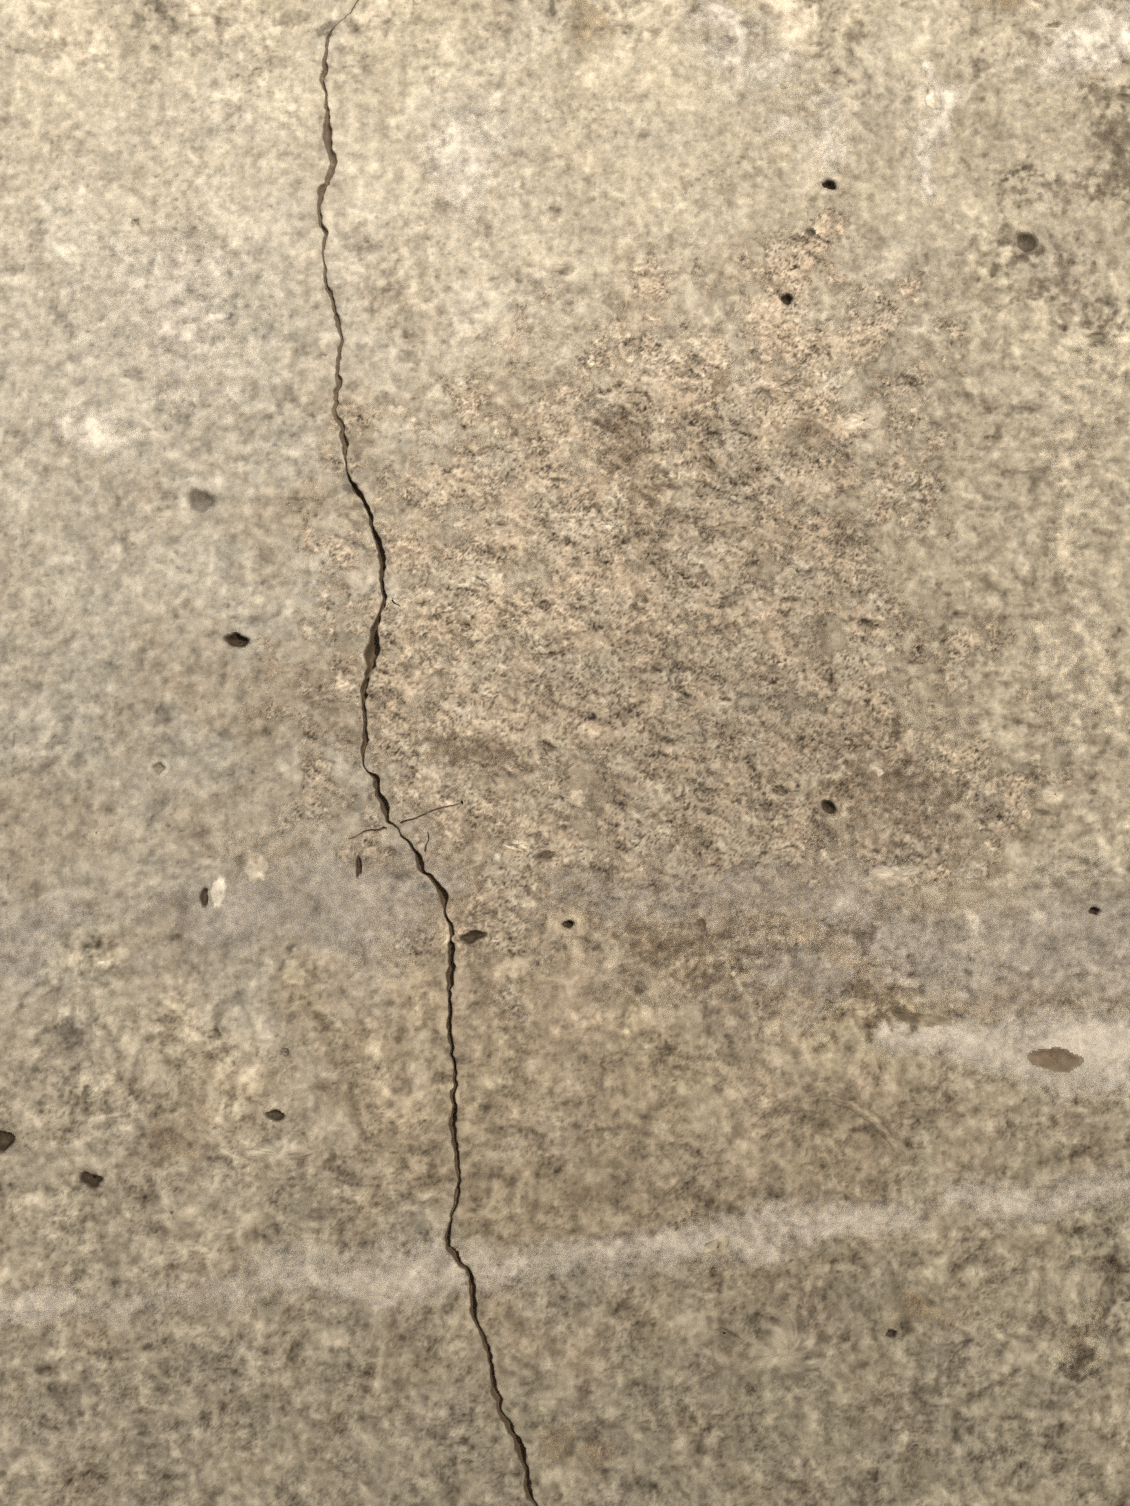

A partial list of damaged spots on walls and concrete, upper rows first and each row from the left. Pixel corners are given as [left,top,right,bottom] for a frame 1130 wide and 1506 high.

crack [305,0,545,1506]